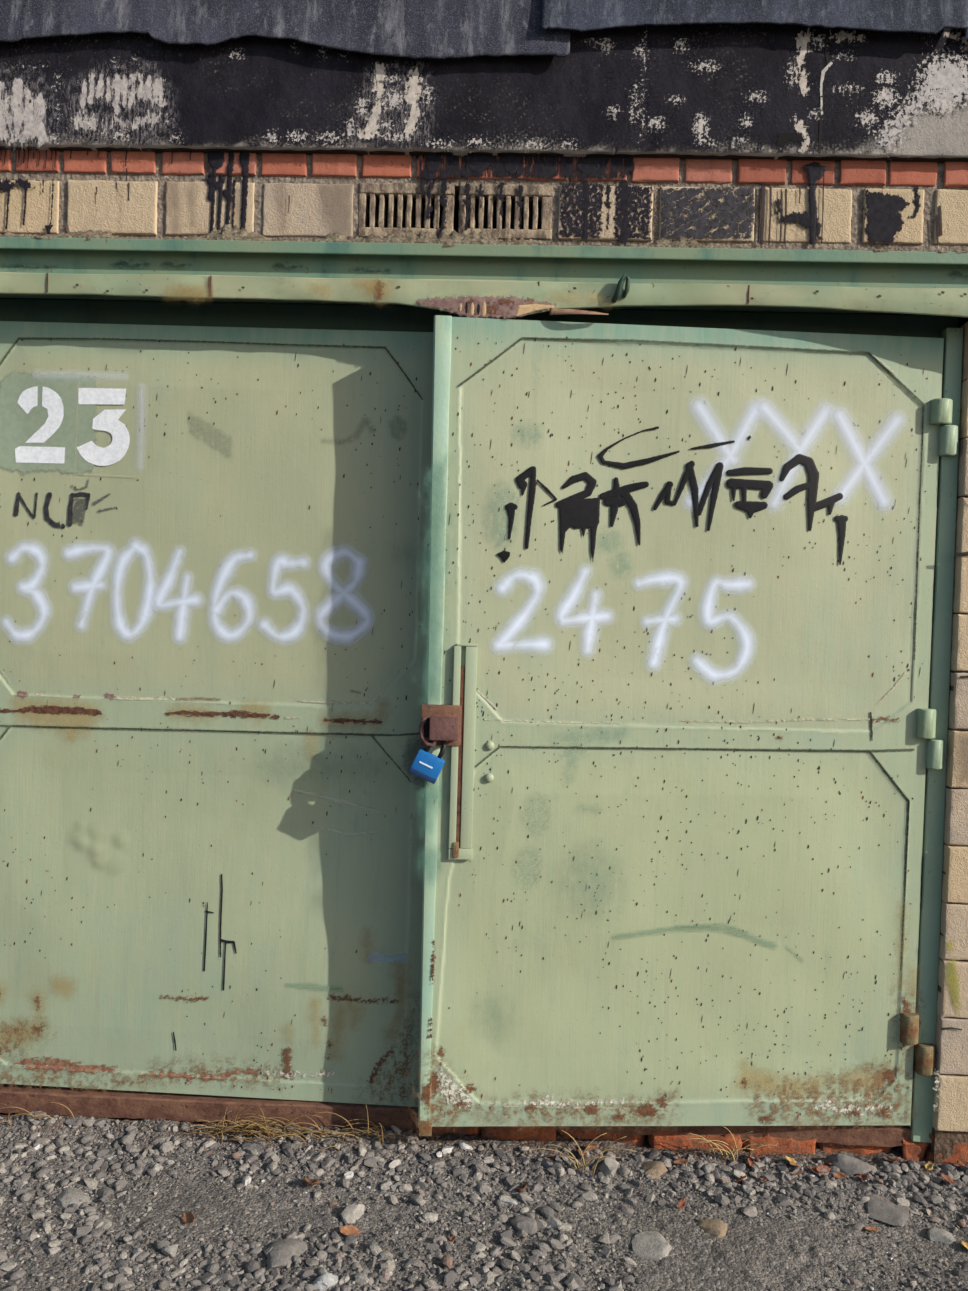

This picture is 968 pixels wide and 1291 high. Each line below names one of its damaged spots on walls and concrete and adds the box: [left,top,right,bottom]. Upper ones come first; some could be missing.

peeling [0,54,185,147]
peeling [263,62,490,153]
spalling [777,28,866,153]
peeling [832,30,968,158]
damp [0,149,99,229]
damp [206,156,249,233]
damp [759,162,827,245]
damp [908,186,921,219]
corrosion [165,698,280,720]
corrosion [0,1016,336,1089]
corrosion [367,1018,476,1130]
corrosion [740,1064,908,1126]